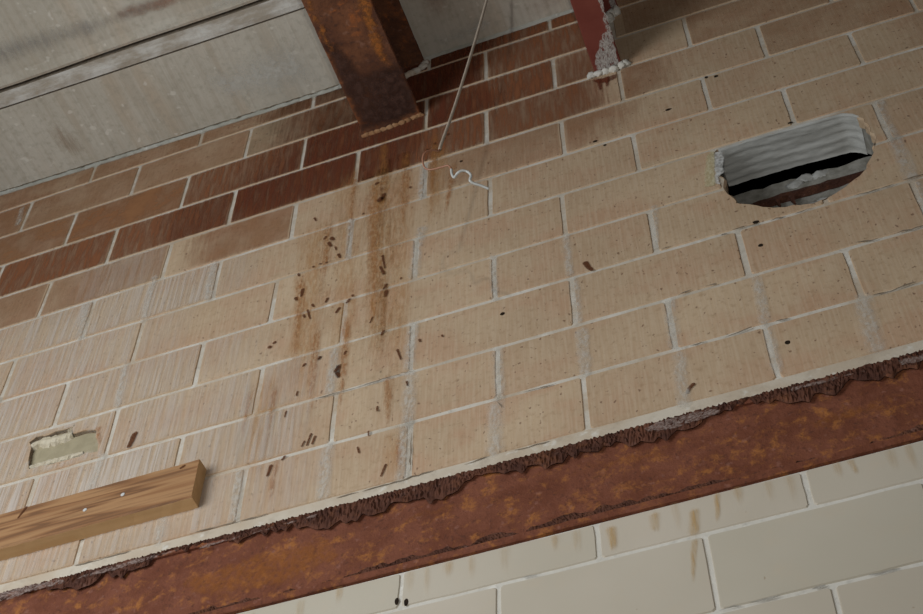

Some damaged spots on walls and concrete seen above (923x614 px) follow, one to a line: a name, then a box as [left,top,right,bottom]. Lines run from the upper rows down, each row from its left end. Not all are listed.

corrosion [0,12,616,335]
hole [705,113,876,208]
spalling [29,425,100,469]